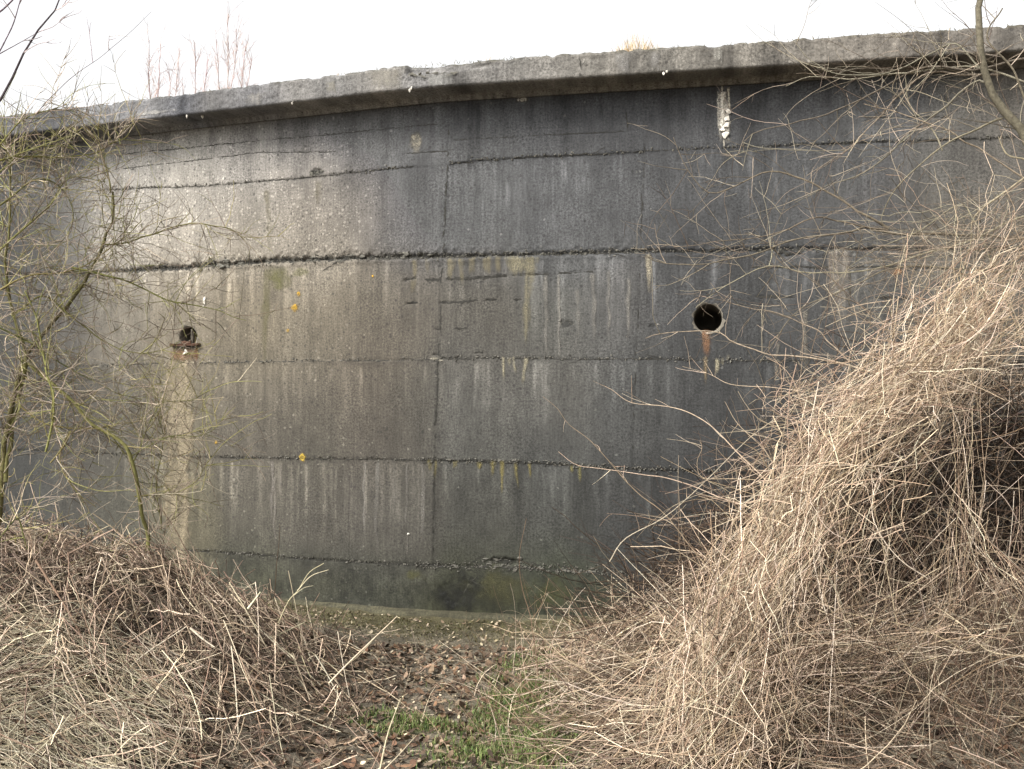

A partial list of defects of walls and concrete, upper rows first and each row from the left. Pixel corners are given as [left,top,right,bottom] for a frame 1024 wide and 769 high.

water stain [717,86,731,143]
water stain [448,257,534,335]
rust [702,331,710,379]